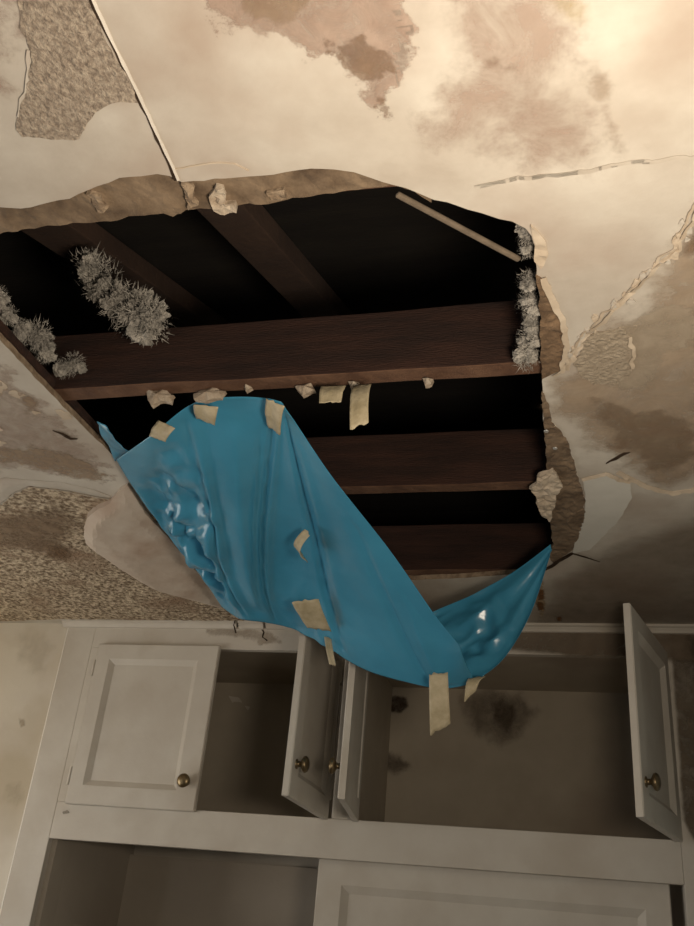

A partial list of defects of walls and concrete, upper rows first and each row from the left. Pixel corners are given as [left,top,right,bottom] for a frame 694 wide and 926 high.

spalling [16,0,138,140]
water stain [207,0,419,107]
peeling [181,182,238,215]
peeling [266,186,287,201]
crack [474,155,694,189]
water stain [557,240,694,485]
crack [606,452,630,464]
peeling [529,468,563,522]
spalling [0,478,244,621]
crack [545,552,600,571]
water stain [512,632,626,657]
water stain [653,634,694,838]